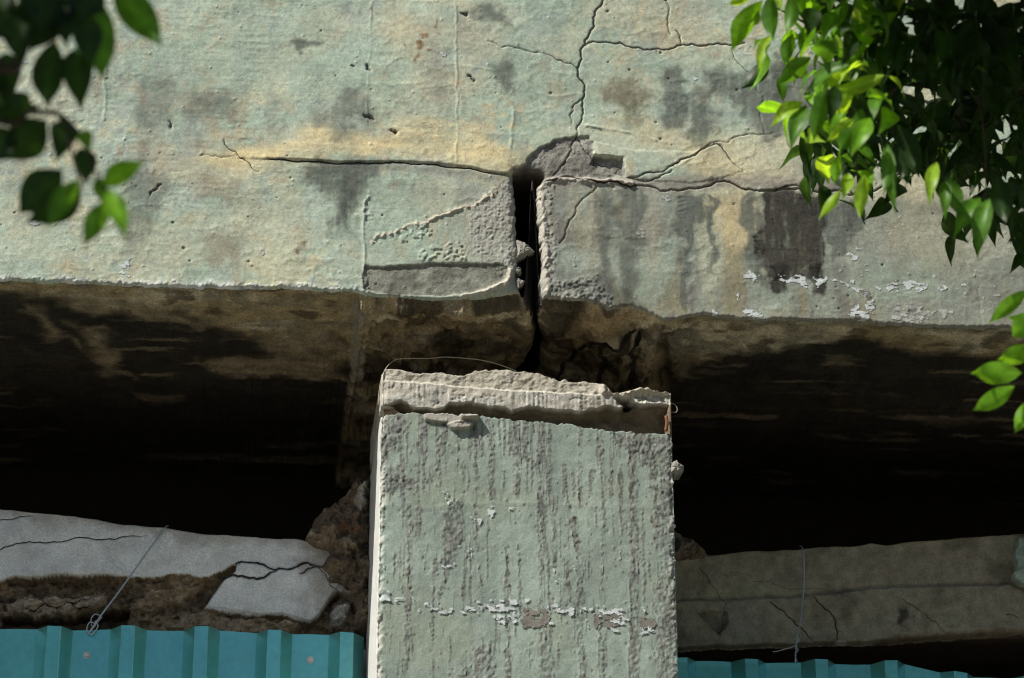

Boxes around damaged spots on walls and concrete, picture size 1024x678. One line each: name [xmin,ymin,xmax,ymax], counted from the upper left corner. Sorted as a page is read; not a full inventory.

crack [201,142,505,175]
crack [384,0,899,442]
water stain [739,185,863,294]
spalling [362,263,510,297]
peeling [779,248,970,326]
crack [25,598,94,612]
crack [0,515,145,550]
crack [226,561,336,589]
peeling [379,415,678,678]
crack [755,581,844,643]